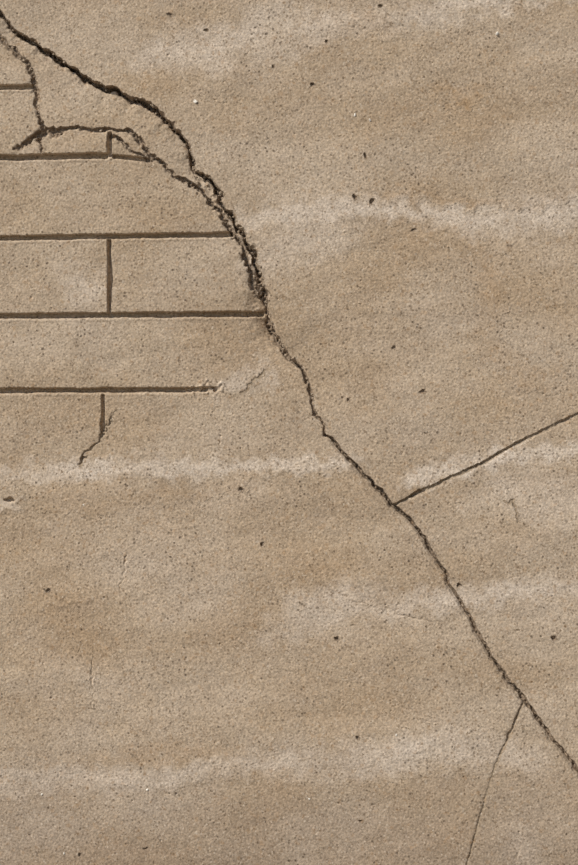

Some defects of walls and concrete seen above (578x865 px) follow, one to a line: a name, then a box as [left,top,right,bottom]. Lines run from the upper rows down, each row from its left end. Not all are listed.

crack [0,9,329,437]
crack [78,409,118,468]
crack [327,412,578,865]